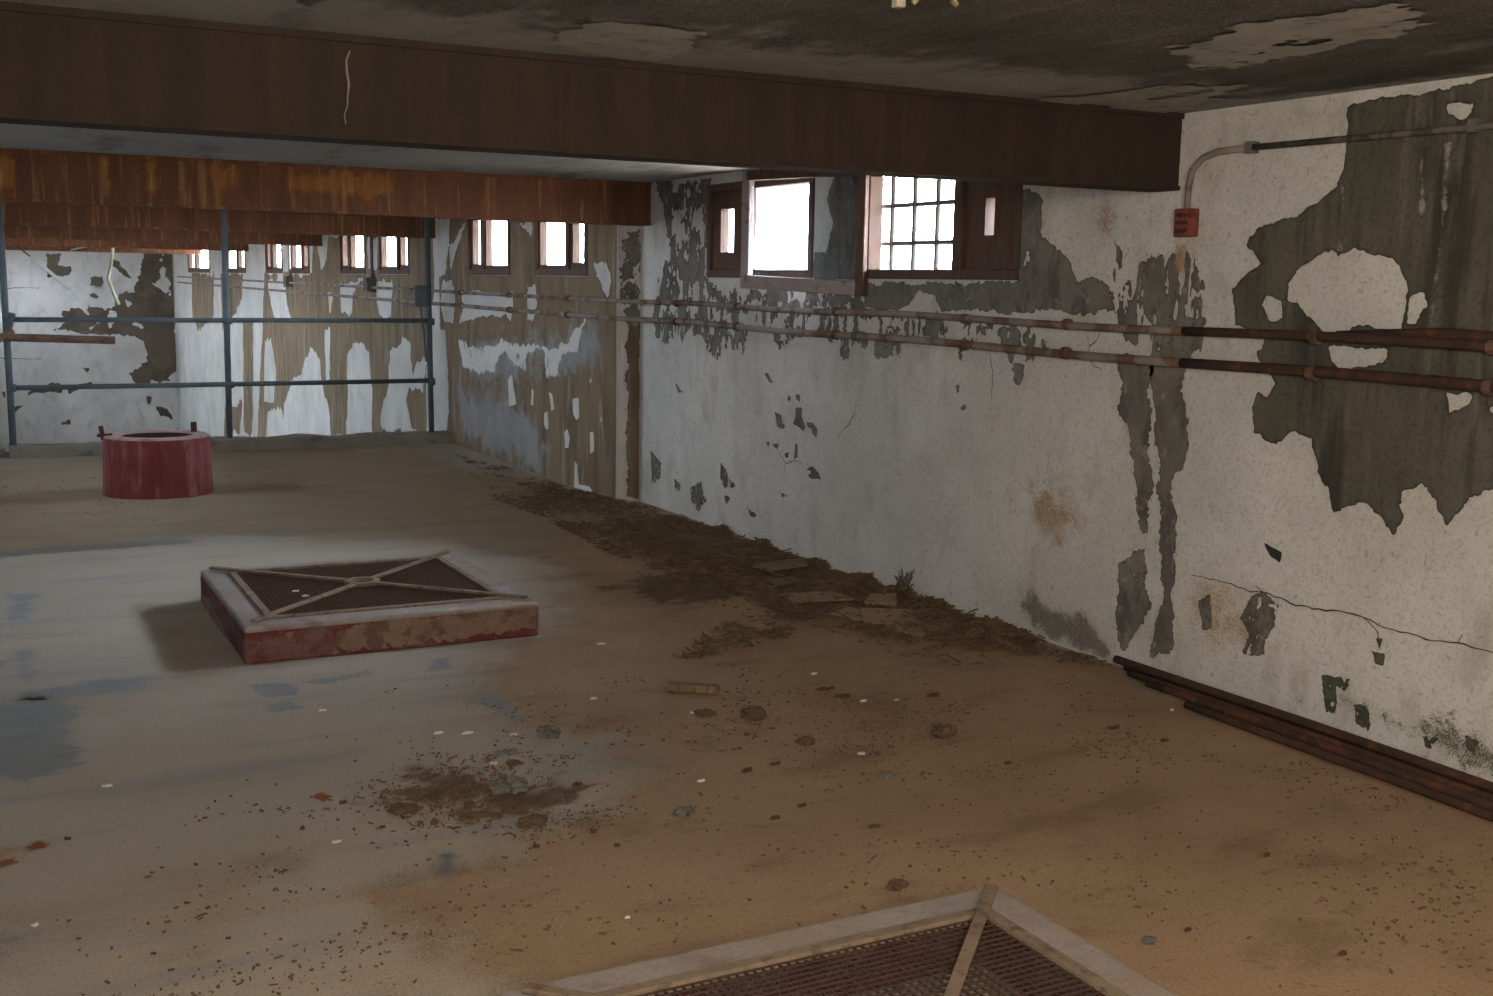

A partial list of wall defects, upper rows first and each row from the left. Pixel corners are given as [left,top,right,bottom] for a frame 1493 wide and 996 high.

peeling [46,253,72,278]
peeling [1232,76,1493,535]
peeling [2,367,92,412]
peeling [54,175,1207,659]
leakage [0,539,195,557]
peeling [1198,594,1212,630]
peeling [1240,592,1279,656]
crack [1192,575,1493,653]
leakage [0,647,163,784]